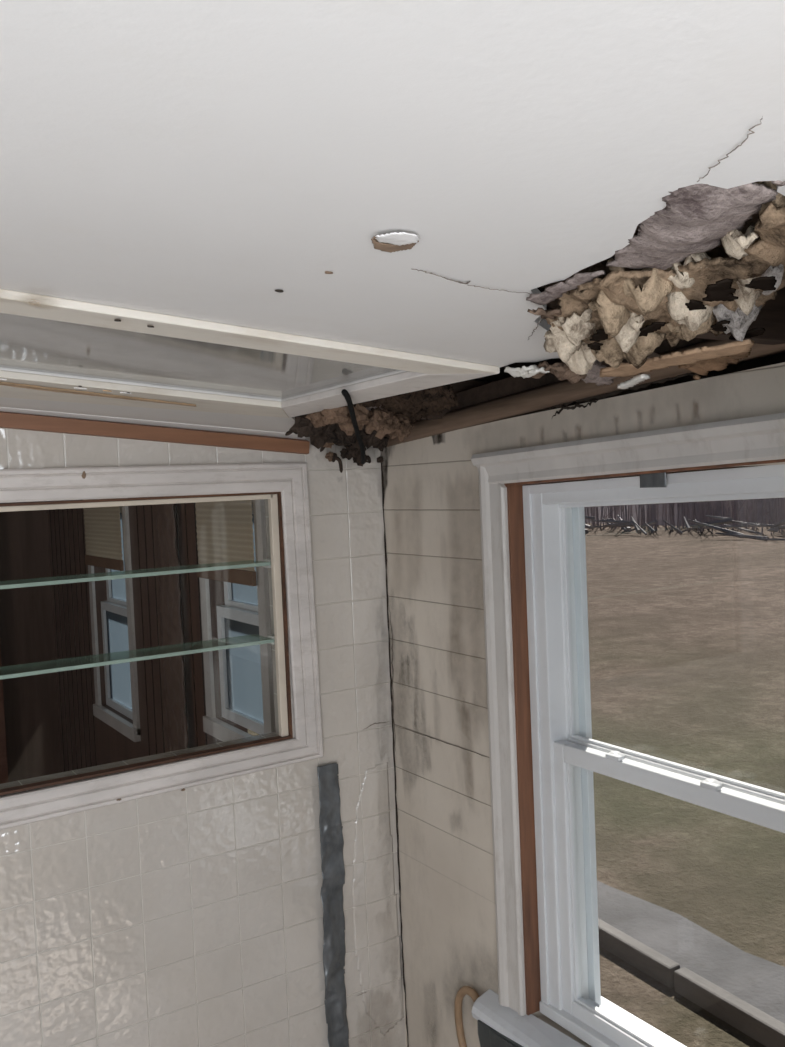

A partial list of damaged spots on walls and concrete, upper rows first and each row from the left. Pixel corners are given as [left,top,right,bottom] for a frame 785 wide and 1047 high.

crack [697,118,762,182]
crack [412,269,530,294]
spalling [504,361,567,379]